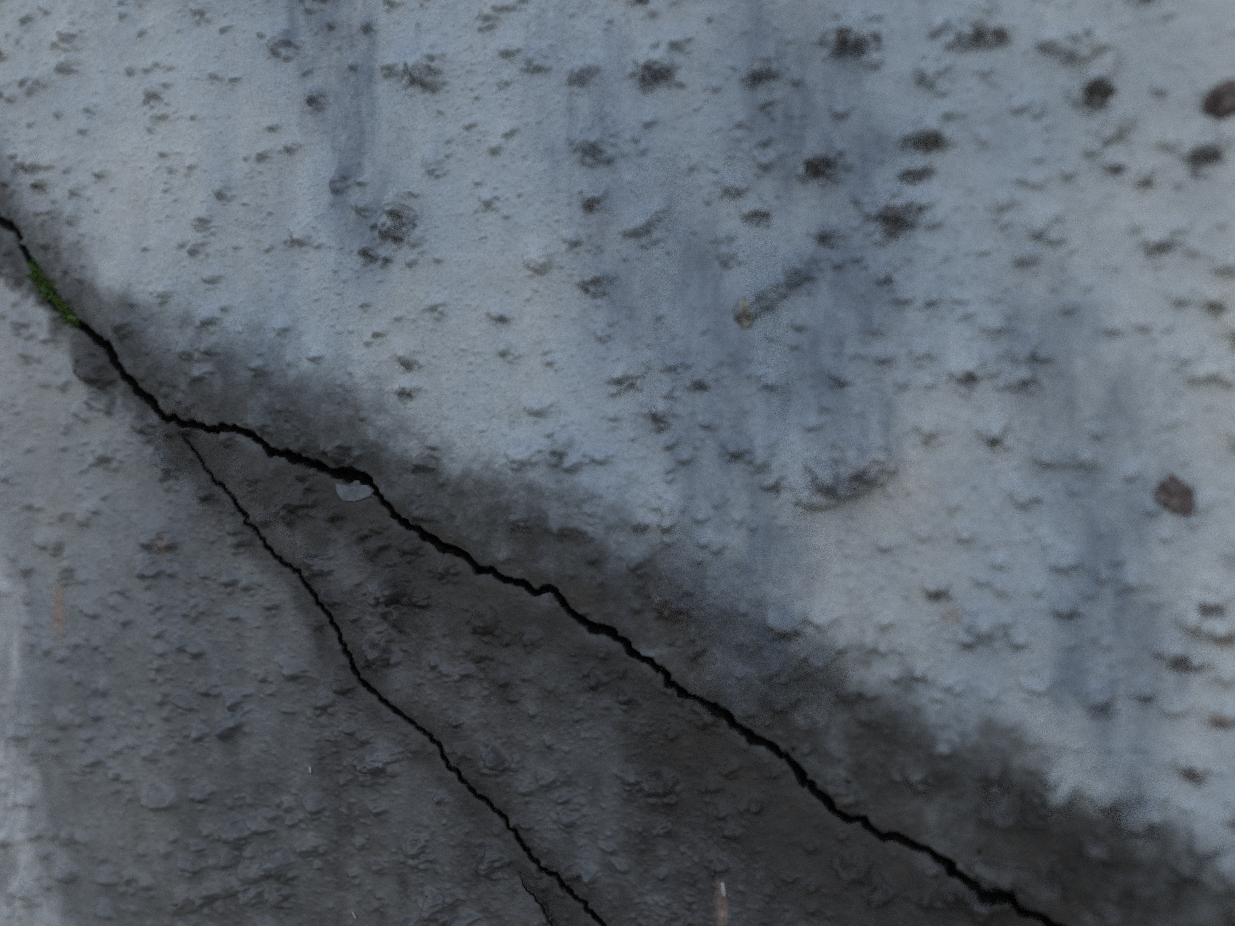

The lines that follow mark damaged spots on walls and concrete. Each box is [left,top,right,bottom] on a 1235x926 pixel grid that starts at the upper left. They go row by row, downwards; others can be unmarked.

crack [0,214,1064,926]